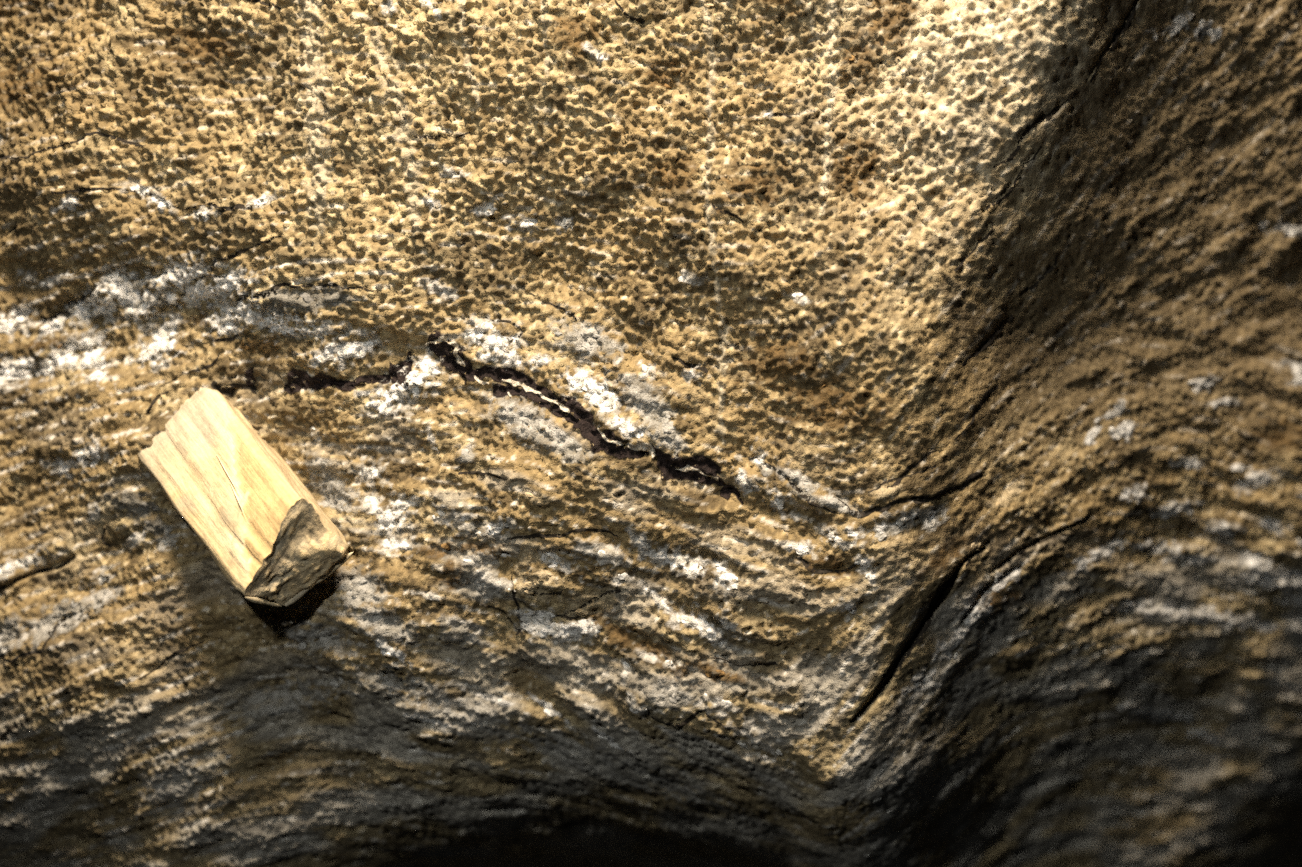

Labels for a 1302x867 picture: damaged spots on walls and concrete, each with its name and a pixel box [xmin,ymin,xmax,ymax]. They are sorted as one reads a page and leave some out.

crack [615,0,645,24]
crack [0,132,145,161]
crack [51,187,267,212]
crack [133,236,381,301]
efflorescence [0,257,382,390]
crack [531,293,577,321]
efflorescence [354,348,455,418]
crack [146,317,744,504]
crack [753,384,999,518]
crack [0,519,120,589]
crack [508,528,618,540]
crack [850,517,1092,722]